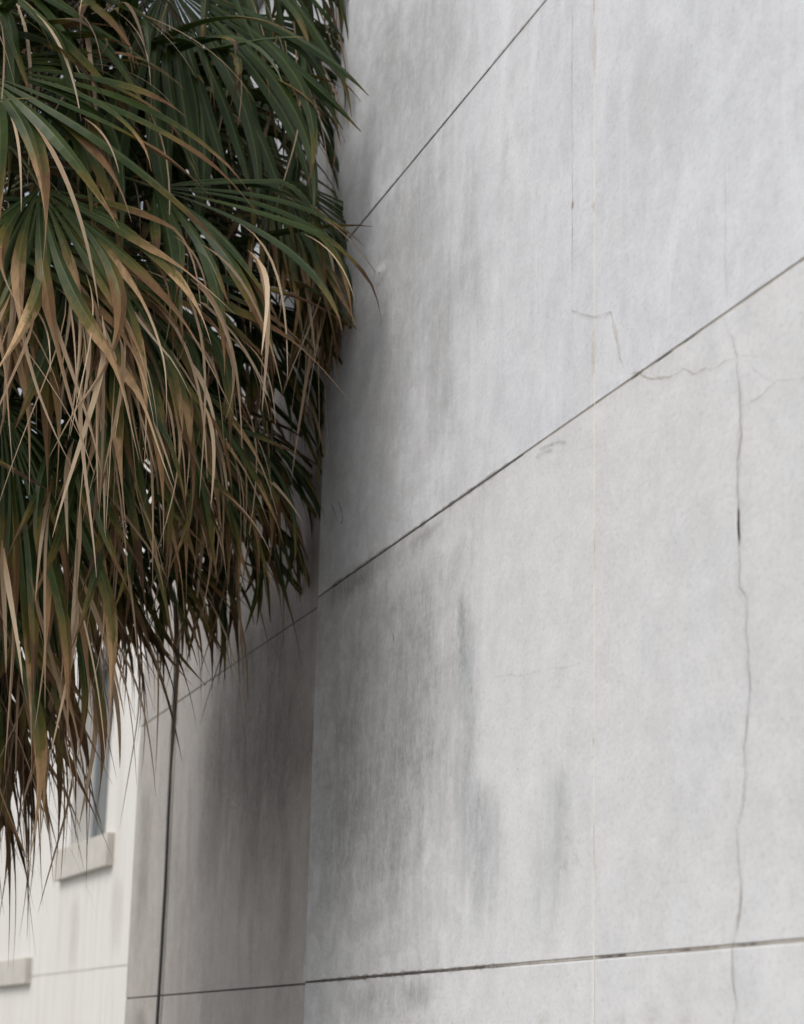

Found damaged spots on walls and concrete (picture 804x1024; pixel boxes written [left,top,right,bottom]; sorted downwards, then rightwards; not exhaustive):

crack [734,508,742,543]